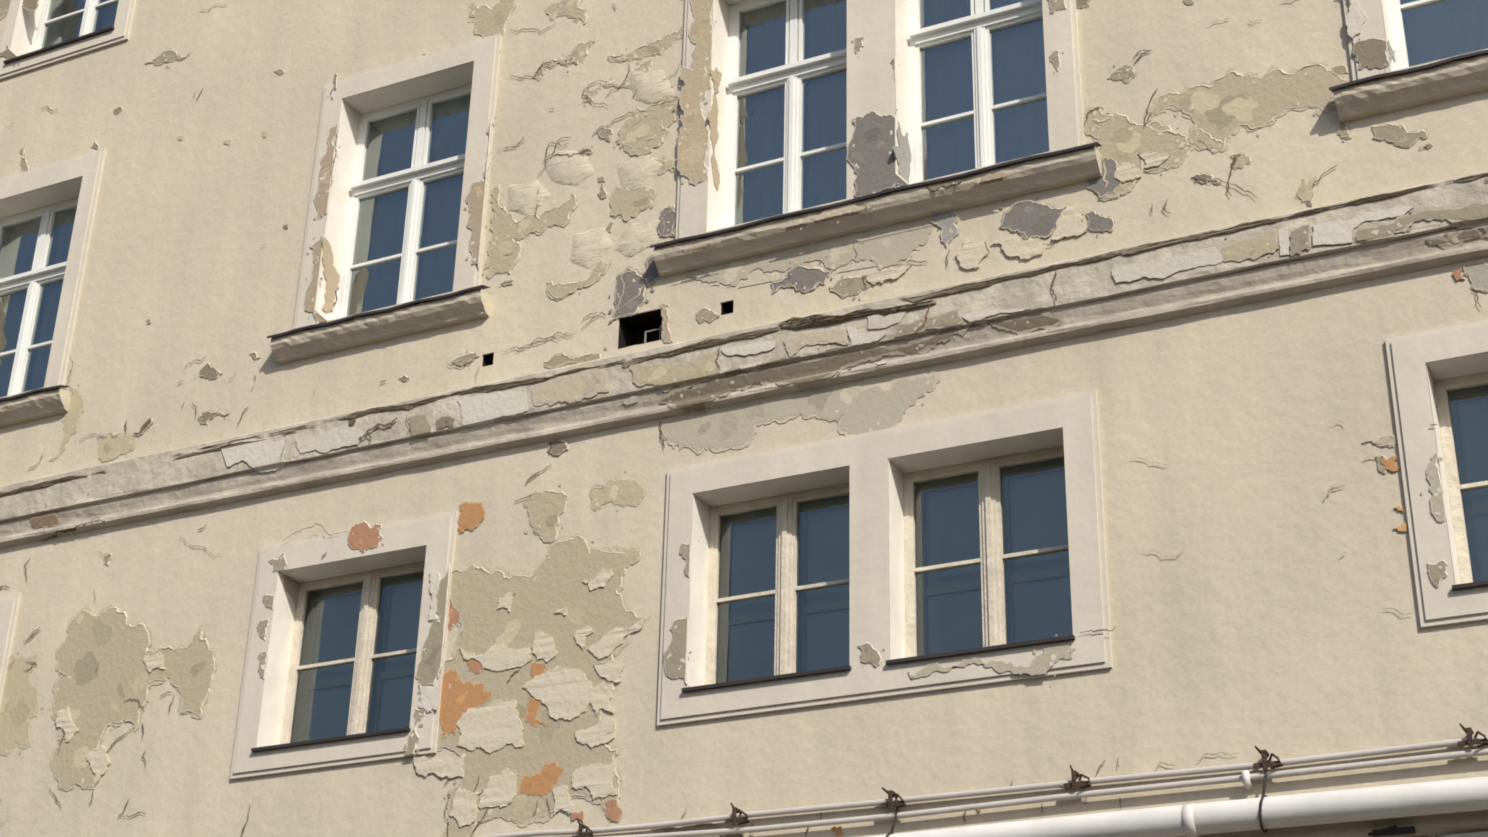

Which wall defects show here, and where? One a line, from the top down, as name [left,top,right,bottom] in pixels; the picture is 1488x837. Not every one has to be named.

peeling [0,0,10,20]
spalling [0,45,19,66]
peeling [20,142,31,172]
peeling [169,0,1488,474]
peeling [1421,452,1447,523]
peeling [404,483,646,837]
peeling [663,615,692,687]
peeling [50,605,218,792]